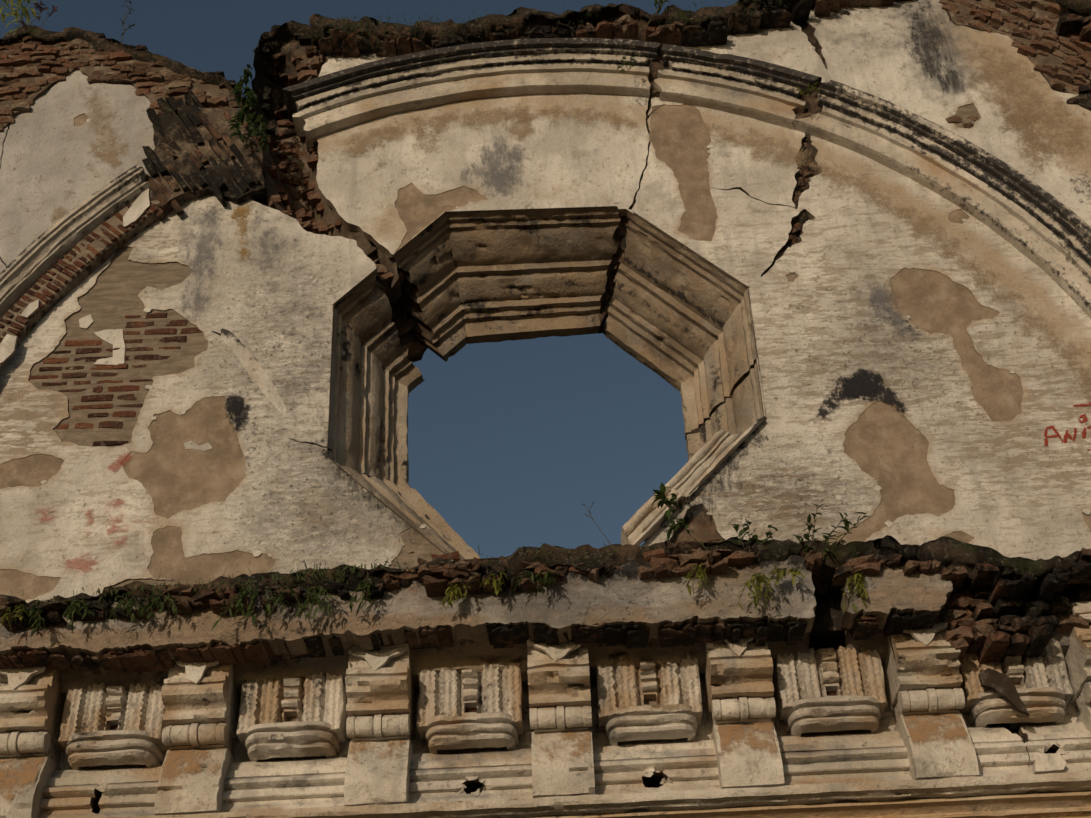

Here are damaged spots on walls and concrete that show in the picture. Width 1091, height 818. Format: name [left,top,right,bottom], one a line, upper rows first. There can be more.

crack [251,25,427,363]
flaking render [395,183,488,252]
leakage [346,108,597,195]
crack [598,50,668,335]
flaking render [648,104,717,241]
crack [720,22,827,277]
leakage [911,13,1083,166]
flaking render [29,247,275,591]
leakage [225,395,248,432]
leakage [813,368,906,419]
flaking render [828,401,955,545]
flaking render [890,268,1023,422]